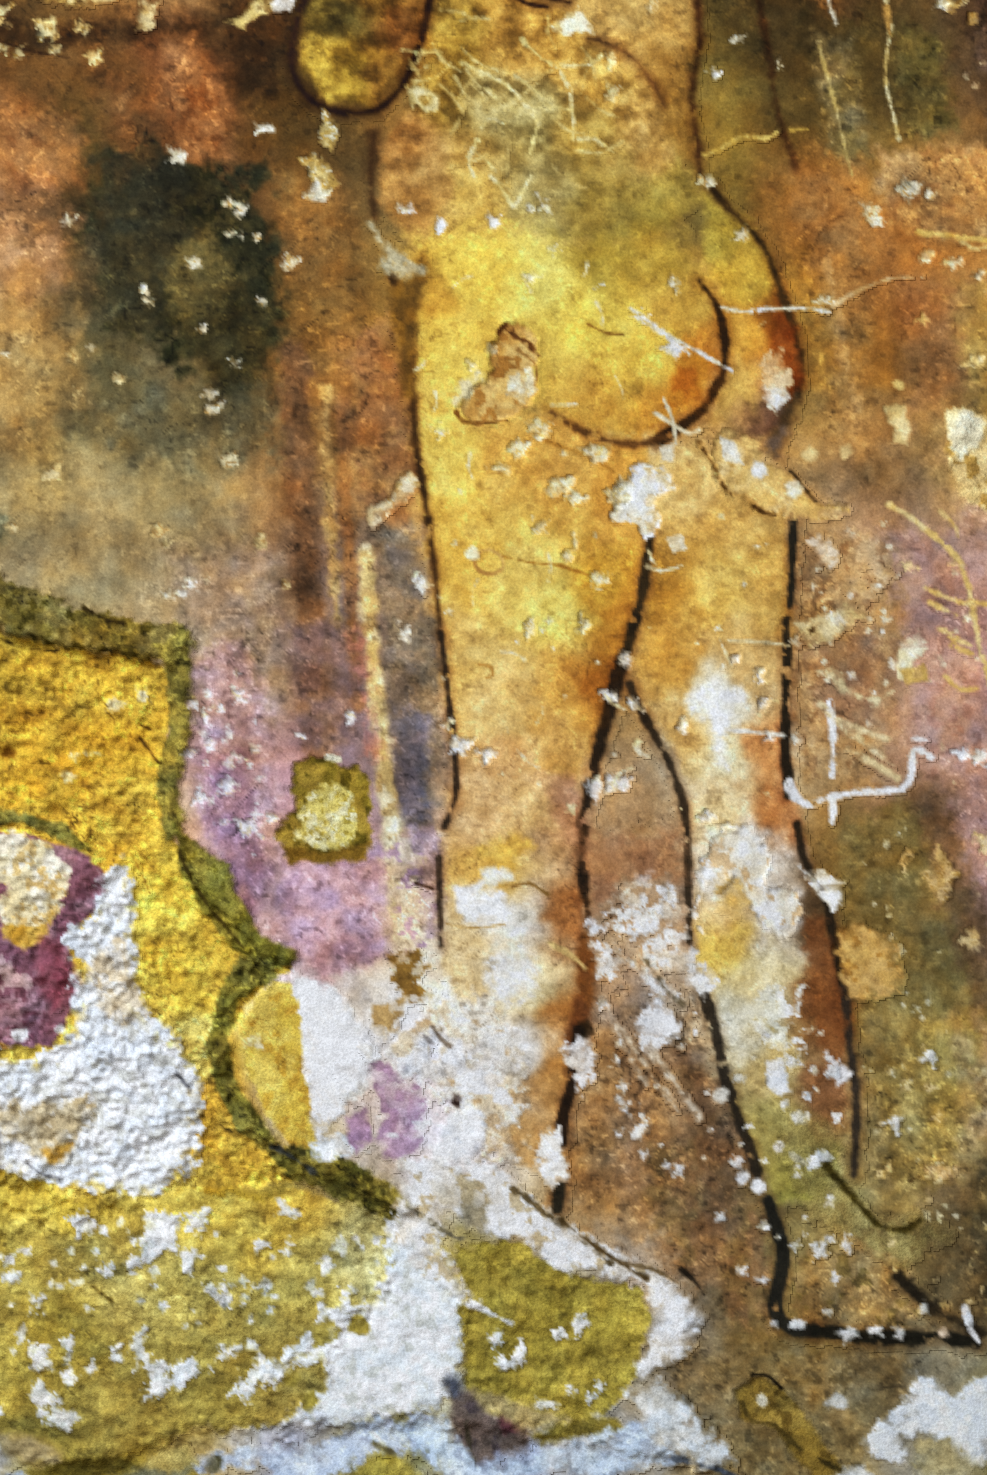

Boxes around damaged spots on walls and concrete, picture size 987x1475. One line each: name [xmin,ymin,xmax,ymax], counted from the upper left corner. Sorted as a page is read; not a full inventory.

spalling [0,632,376,1192]
spalling [368,947,437,1043]
spalling [411,808,933,1143]
spalling [531,1121,572,1193]
water stain [727,1121,771,1173]
water stain [725,1024,846,1129]
water stain [791,1147,836,1182]
spalling [734,979,987,1275]
water stain [753,1191,854,1288]
spalling [436,1236,655,1464]
water stain [767,1266,987,1349]
water stain [843,1369,987,1475]